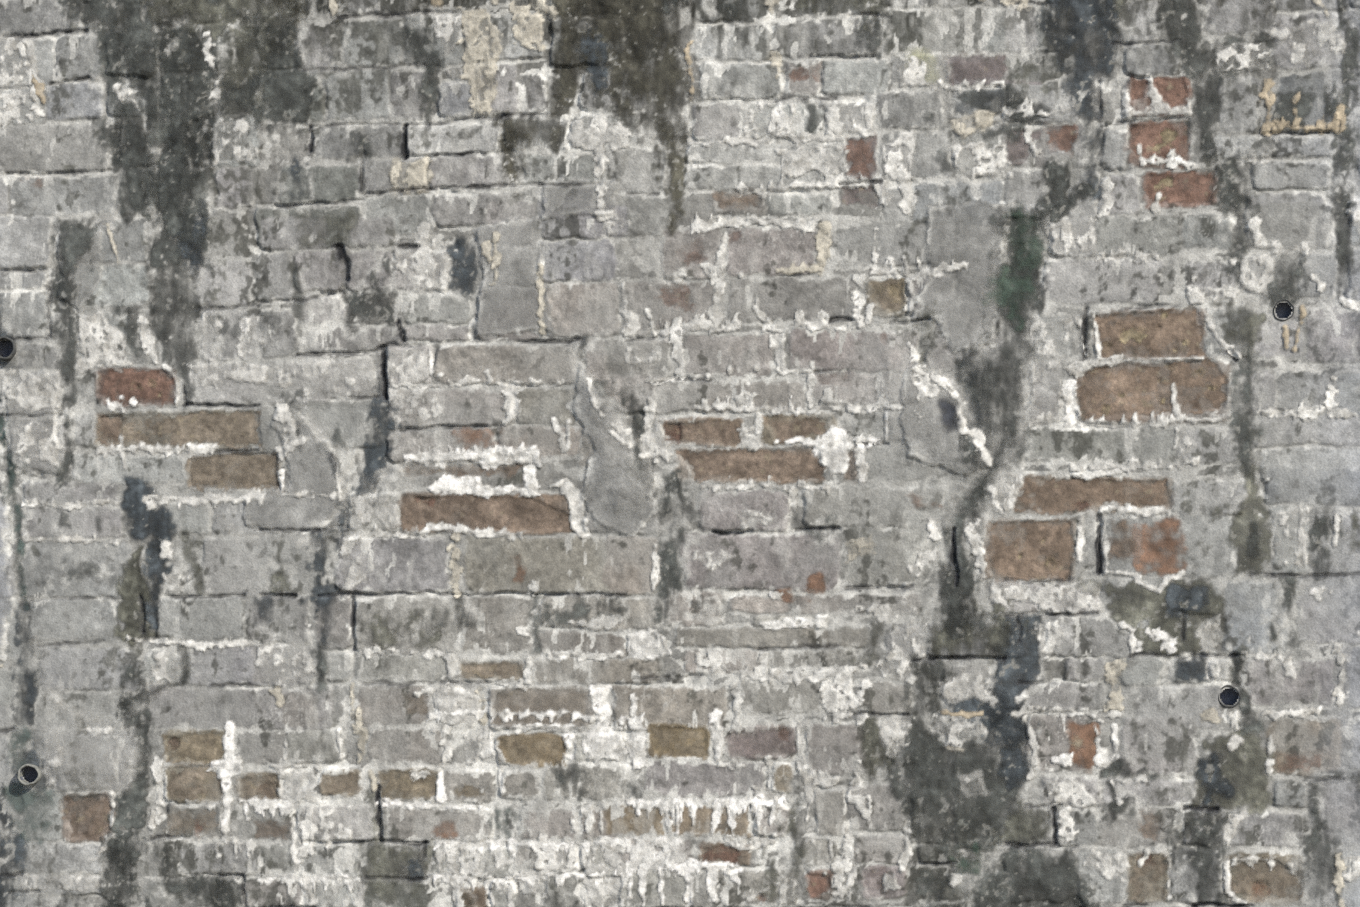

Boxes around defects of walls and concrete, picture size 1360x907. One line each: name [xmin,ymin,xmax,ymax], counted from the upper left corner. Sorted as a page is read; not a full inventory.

spalling [1130,76,1188,106]
spalling [1131,121,1212,203]
water stain [402,0,932,516]
spalling [1078,308,1228,421]
peeling [97,368,345,535]
spalling [659,417,826,482]
water stain [694,0,1360,907]
spalling [399,494,571,532]
spalling [984,477,1167,581]
water stain [497,528,726,691]
spalling [162,731,224,799]
spalling [382,771,436,798]